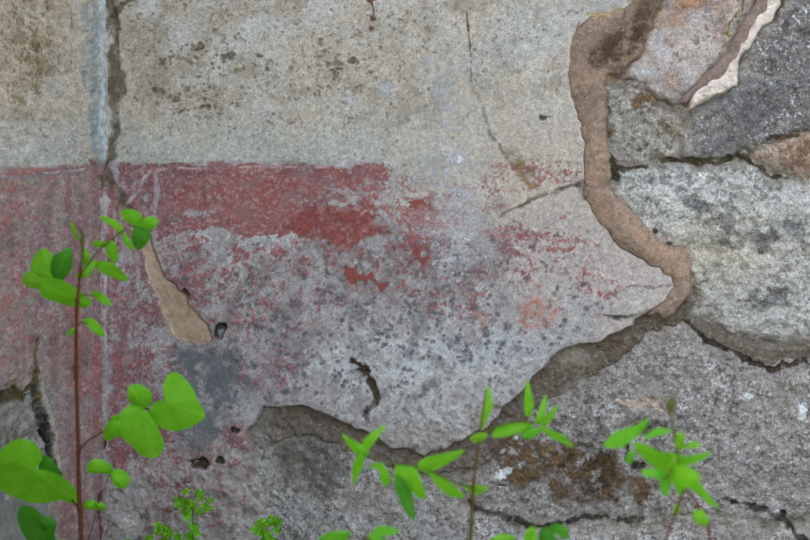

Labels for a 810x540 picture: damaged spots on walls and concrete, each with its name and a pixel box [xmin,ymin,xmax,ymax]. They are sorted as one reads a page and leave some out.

crack [99,0,137,228]
spalling [142,237,212,345]
peeling [288,205,390,245]
peeling [344,265,387,292]
peeling [409,243,431,265]
crack [688,321,808,374]
spalling [0,389,52,455]
crack [30,339,57,465]
crack [349,358,380,417]